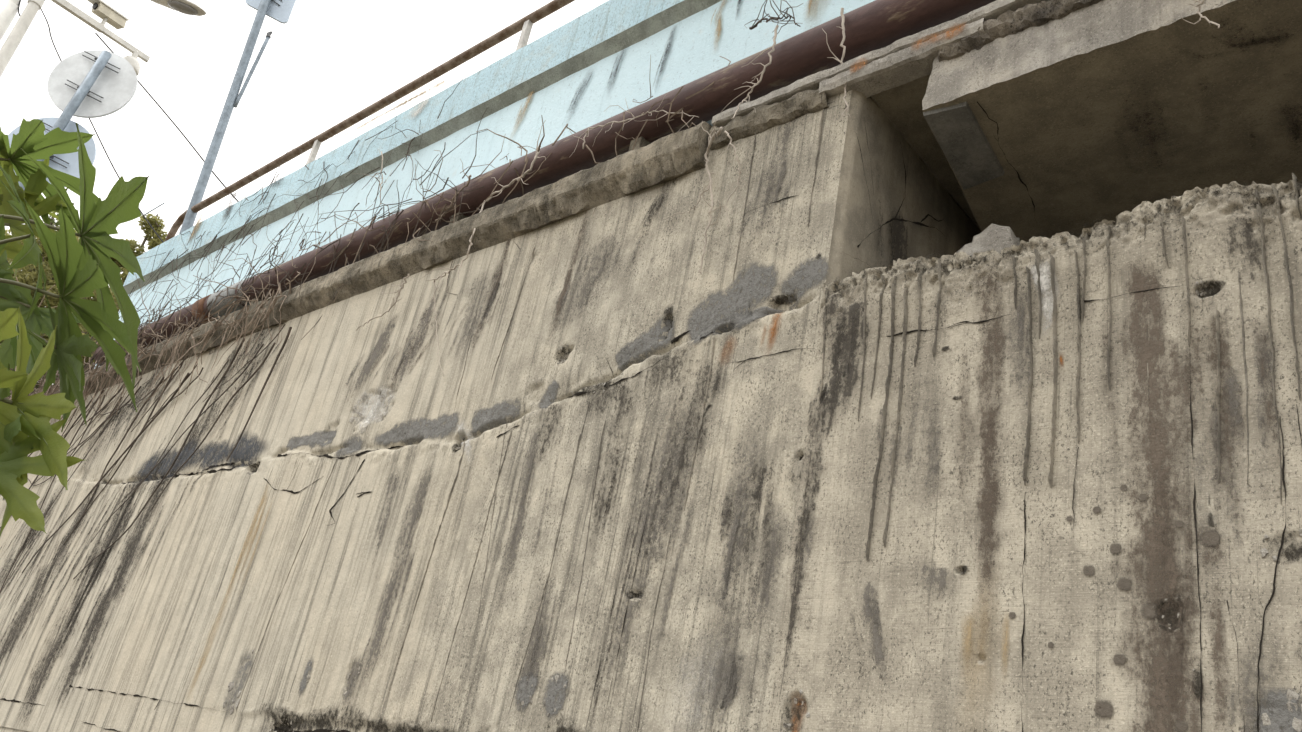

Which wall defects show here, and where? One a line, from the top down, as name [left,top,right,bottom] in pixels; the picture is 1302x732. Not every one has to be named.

rust [819,18,987,99]
leakage [807,109,824,231]
crack [567,330,715,398]
crack [731,348,815,371]
crack [887,314,1010,337]
spalling [1195,280,1224,298]
leakage [697,179,1302,732]
leakage [232,458,338,723]
crack [1190,377,1302,732]
crack [274,724,351,732]